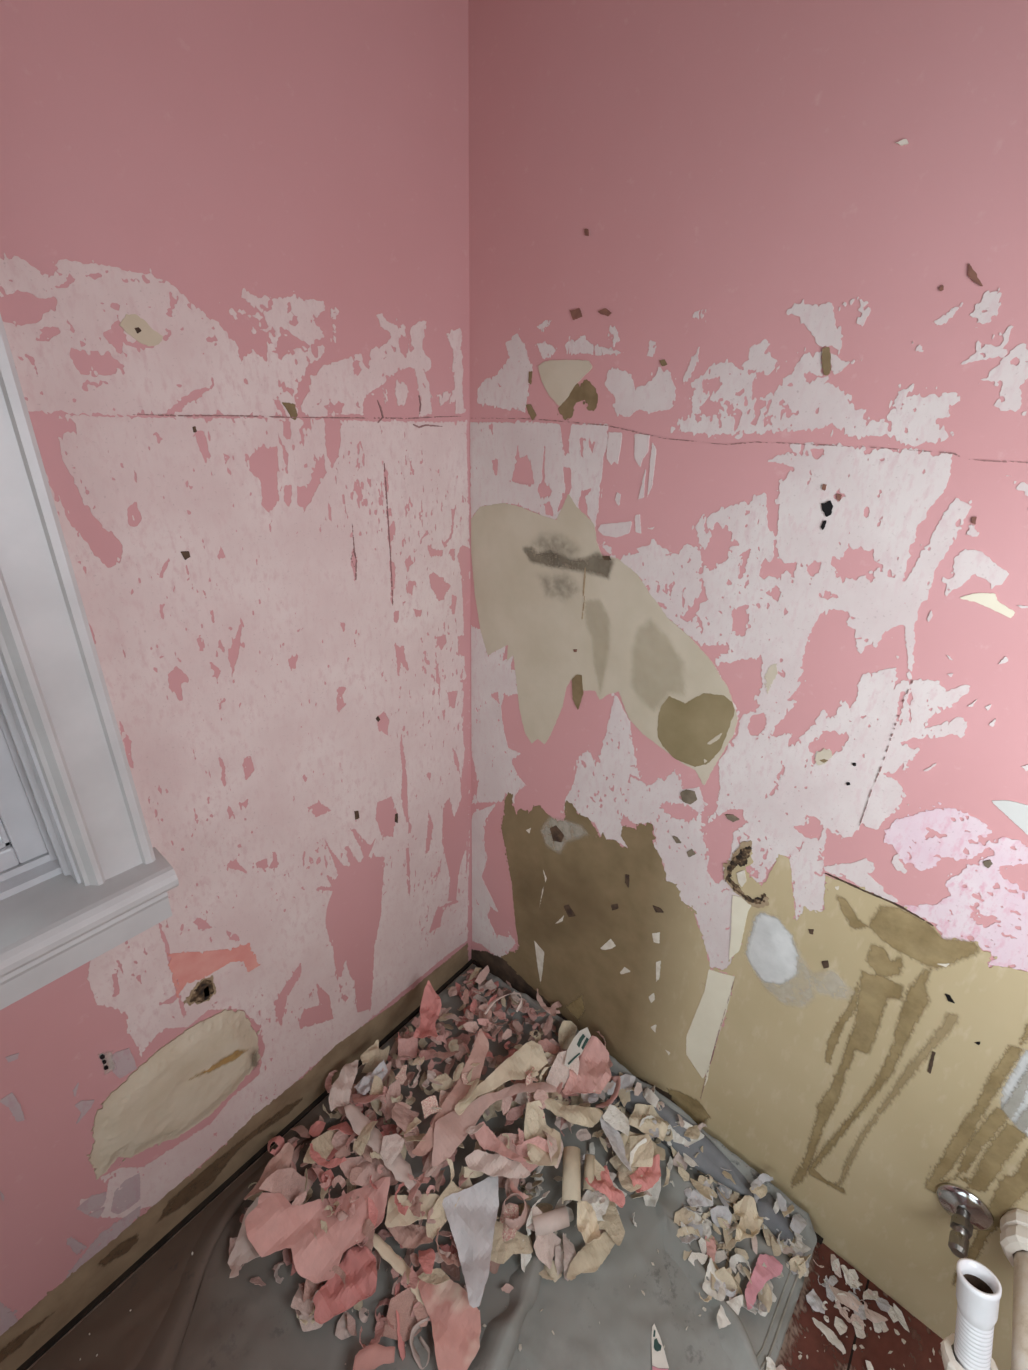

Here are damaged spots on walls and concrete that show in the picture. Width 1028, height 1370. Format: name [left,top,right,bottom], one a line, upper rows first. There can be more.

crack [133,395,1028,463]
peeling [0,253,1028,1278]
leakage [792,897,978,1193]
leakage [926,1025,1028,1260]